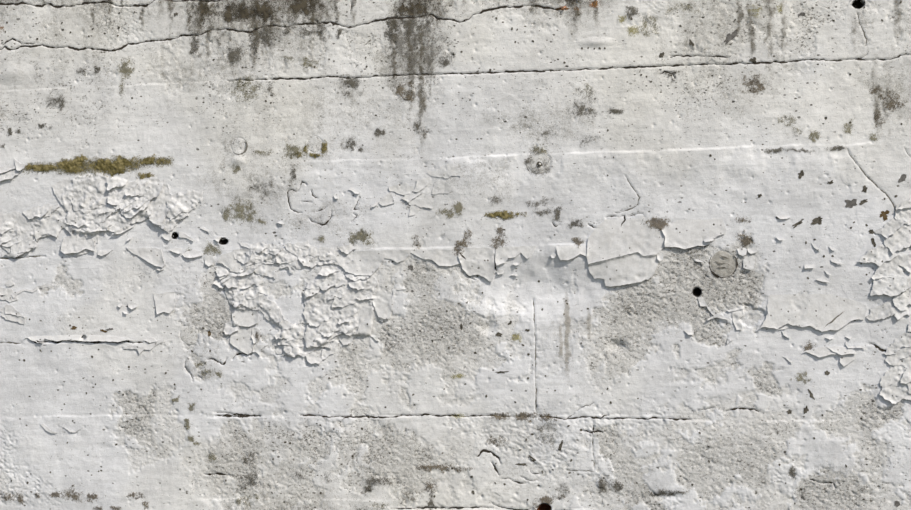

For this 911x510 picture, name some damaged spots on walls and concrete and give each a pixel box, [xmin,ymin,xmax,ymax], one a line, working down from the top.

crack [0,0,222,8]
leakage [187,0,342,64]
crack [0,4,562,52]
leakage [340,74,359,96]
leakage [384,0,454,138]
crack [235,13,908,81]
peeling [845,185,868,208]
peeling [0,164,536,364]
peeling [550,216,726,287]
peeling [759,198,911,404]
crack [216,411,261,419]
crack [303,301,759,472]